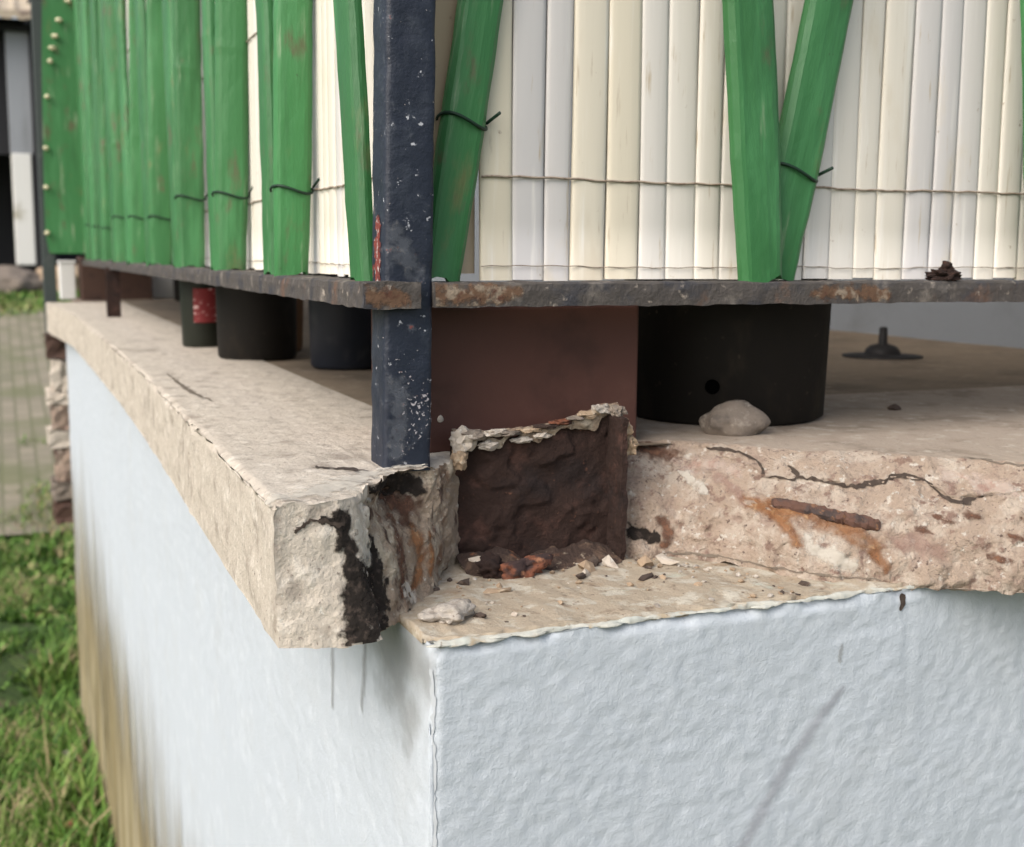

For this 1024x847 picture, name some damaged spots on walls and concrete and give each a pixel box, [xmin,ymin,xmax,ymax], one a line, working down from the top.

rust [435,282,523,307]
peeling [449,403,640,471]
crack [706,447,999,505]
leakage [319,479,422,646]
rust [407,522,435,591]
rust [741,496,889,574]